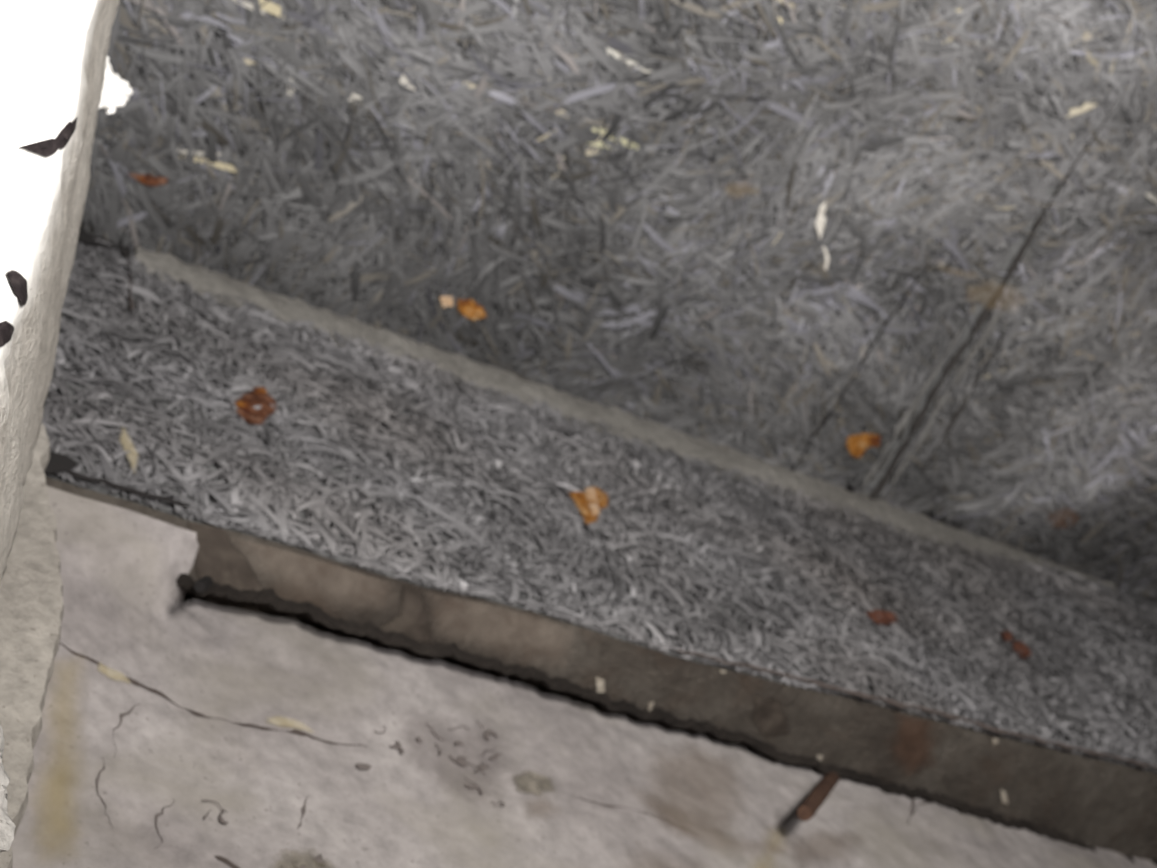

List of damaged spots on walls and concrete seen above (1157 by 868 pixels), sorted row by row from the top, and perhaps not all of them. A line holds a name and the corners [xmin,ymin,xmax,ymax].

corrosion [235,387,277,424]
corrosion [846,433,881,458]
corrosion [569,487,608,524]
crack [59,642,368,829]